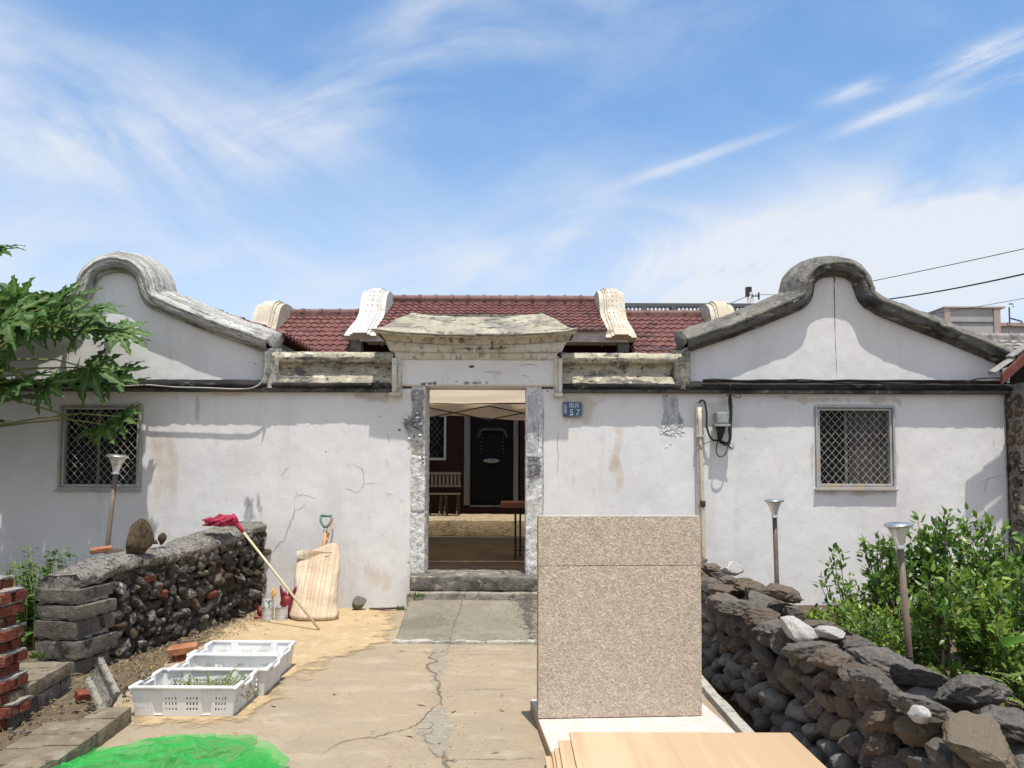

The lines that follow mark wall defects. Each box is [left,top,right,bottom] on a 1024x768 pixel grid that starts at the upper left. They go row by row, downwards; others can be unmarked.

spalling [398,390,425,463]
peeling [660,395,685,447]